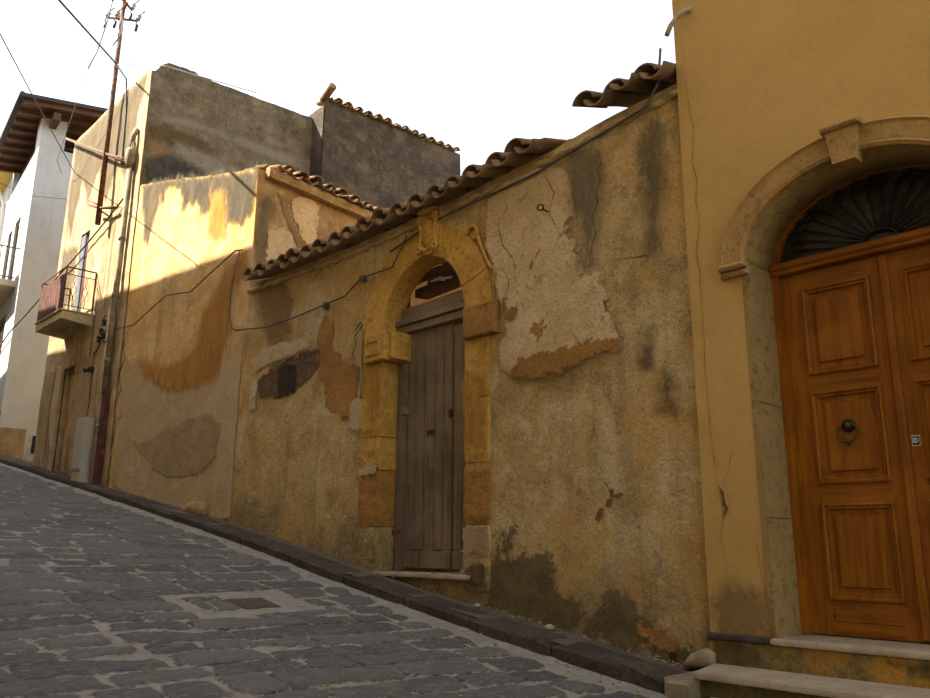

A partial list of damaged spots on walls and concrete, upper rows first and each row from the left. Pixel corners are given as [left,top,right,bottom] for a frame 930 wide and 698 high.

damp [60,247,77,308]
damp [68,73,146,236]
damp [141,125,272,264]
peeling [115,278,363,519]
peeling [484,165,626,382]
damp [639,121,661,252]
crack [683,64,740,614]
damp [484,522,775,666]